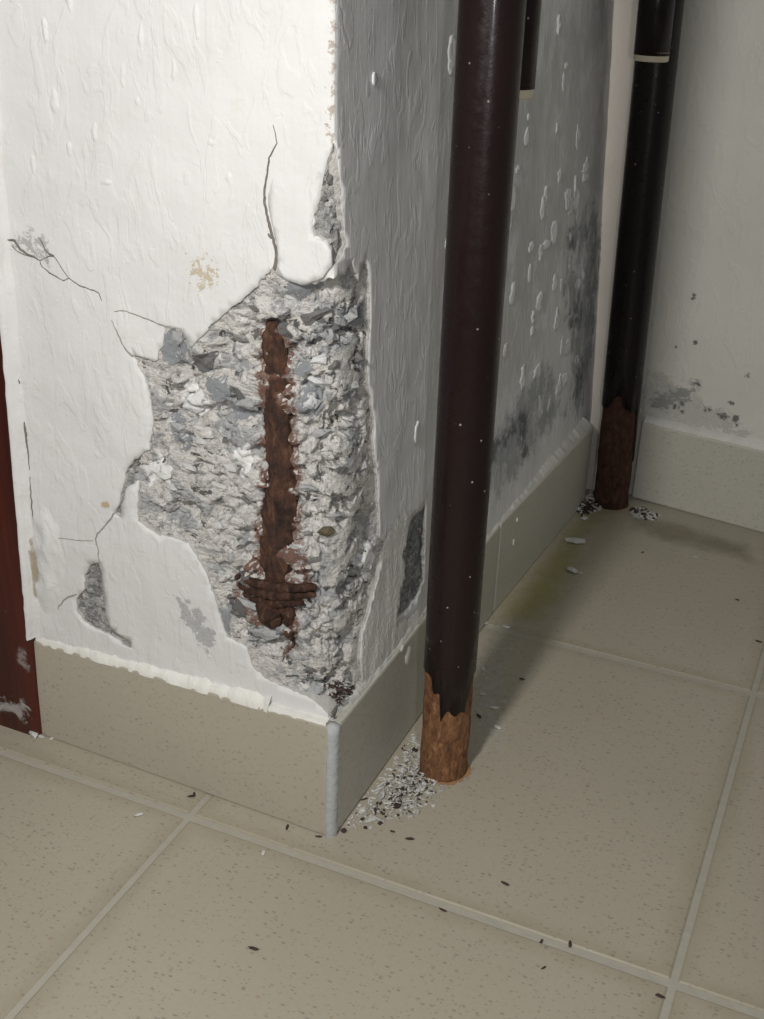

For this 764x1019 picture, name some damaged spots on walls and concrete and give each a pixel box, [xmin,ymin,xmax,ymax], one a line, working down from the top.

crack [263,126,278,271]
spalling [314,169,341,258]
crack [8,237,166,357]
peeling [78,563,131,647]
spalling [116,264,383,703]
corrosion [231,423,271,629]
corrosion [255,319,312,584]
corrosion [282,599,304,659]
peeling [397,509,423,614]
water stain [490,203,601,496]
water stain [638,372,747,438]